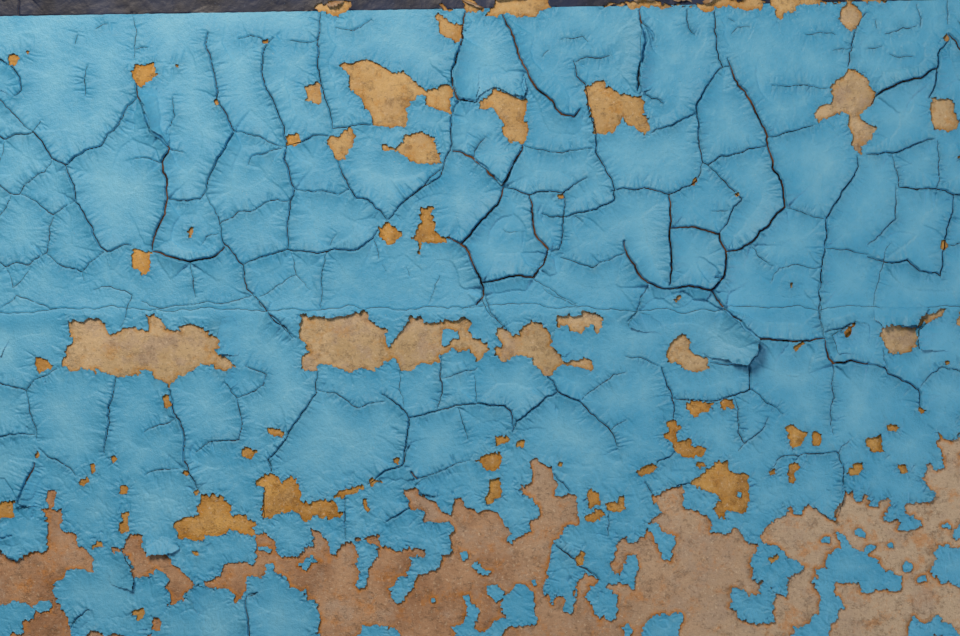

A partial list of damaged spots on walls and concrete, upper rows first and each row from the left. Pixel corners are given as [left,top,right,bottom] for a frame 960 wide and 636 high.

peeling [314,0,352,17]
peeling [604,0,887,32]
peeling [339,59,453,165]
peeling [476,73,529,144]
peeling [584,80,650,136]
peeling [814,69,877,155]
crack [0,12,960,519]
peeling [35,313,245,409]
peeling [299,310,603,376]
peeling [874,303,960,365]
crack [0,369,75,561]
peeling [0,419,960,636]